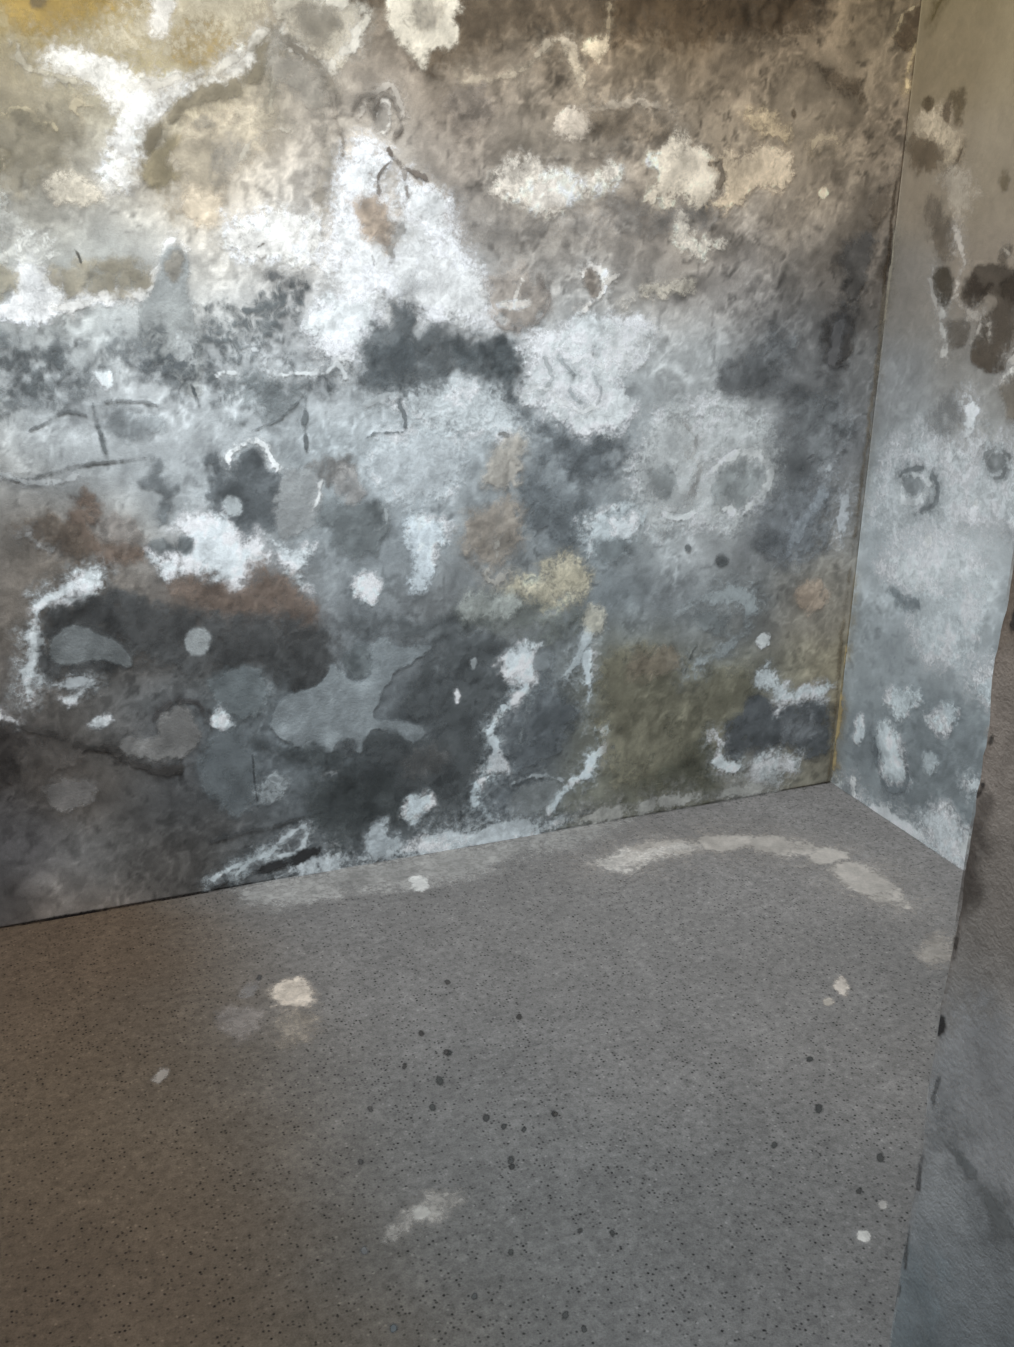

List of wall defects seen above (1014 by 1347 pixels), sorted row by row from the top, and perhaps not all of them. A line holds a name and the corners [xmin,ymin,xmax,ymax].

leakage [926,167,978,260]
crack [0,399,165,486]
crack [255,395,309,452]
crack [367,400,407,438]
leakage [0,0,915,914]
leakage [867,395,1014,707]
leakage [831,774,992,912]
leakage [917,935,953,965]